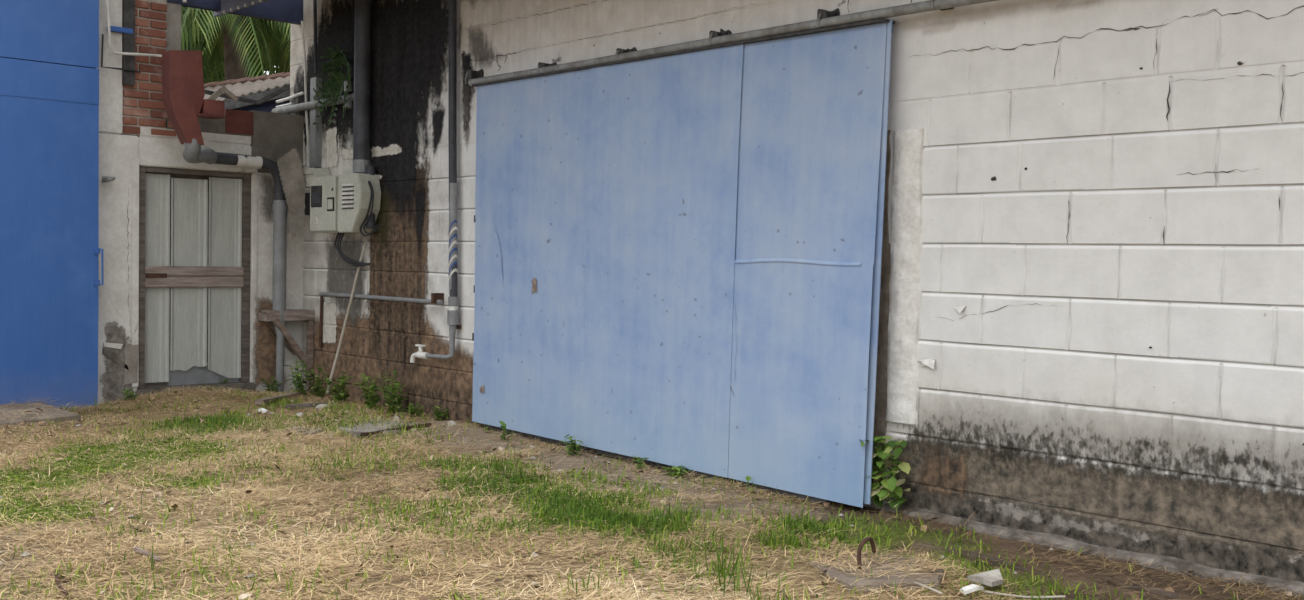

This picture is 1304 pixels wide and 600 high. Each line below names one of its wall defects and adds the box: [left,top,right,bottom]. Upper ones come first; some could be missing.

leakage [292,0,355,149]
peeling [326,127,353,169]
peeling [372,144,402,157]
leakage [307,0,485,425]
crack [910,5,1304,120]
leakage [892,415,1304,583]